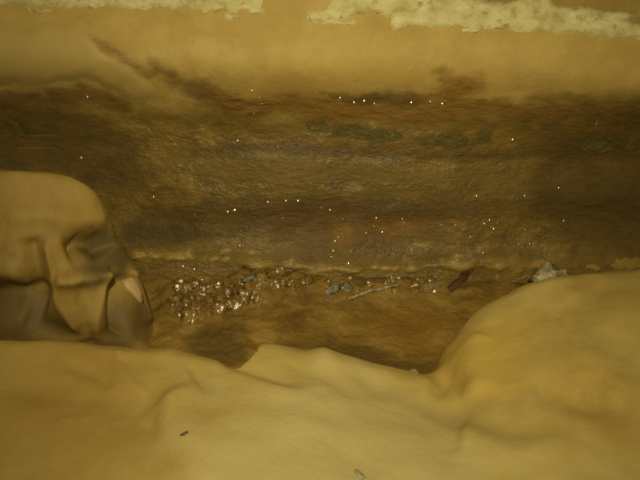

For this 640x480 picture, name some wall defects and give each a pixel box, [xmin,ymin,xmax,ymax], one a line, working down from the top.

peeling [0,0,265,20]
peeling [307,0,640,40]
damp [0,99,640,283]